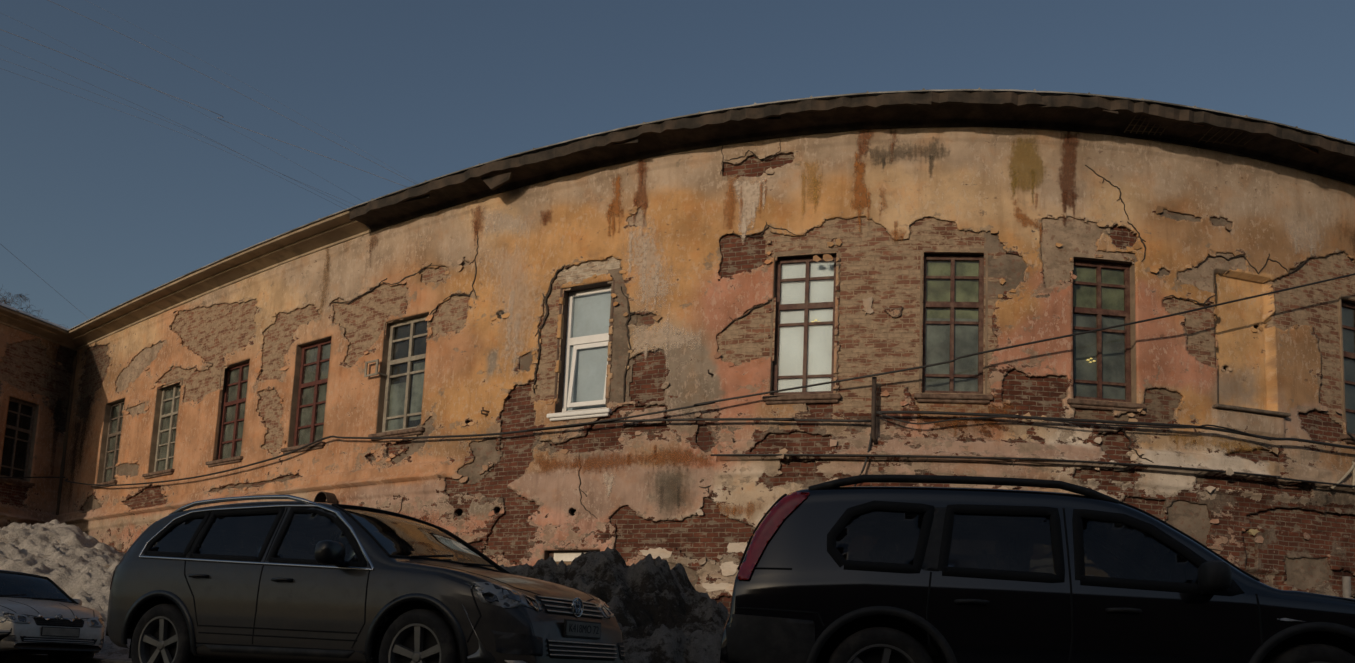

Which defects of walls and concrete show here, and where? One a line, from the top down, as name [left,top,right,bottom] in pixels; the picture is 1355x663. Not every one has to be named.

corrosion [608,159,648,235]
spalling [723,153,795,177]
leakage [1009,138,1043,201]
crack [1085,165,1146,261]
spalling [46,258,470,454]
spalling [446,257,669,563]
spalling [695,412,715,453]
spalling [714,213,1312,546]
spalling [1250,252,1355,443]
spalling [113,460,167,509]
spalling [604,497,755,588]
peeling [1284,554,1355,591]